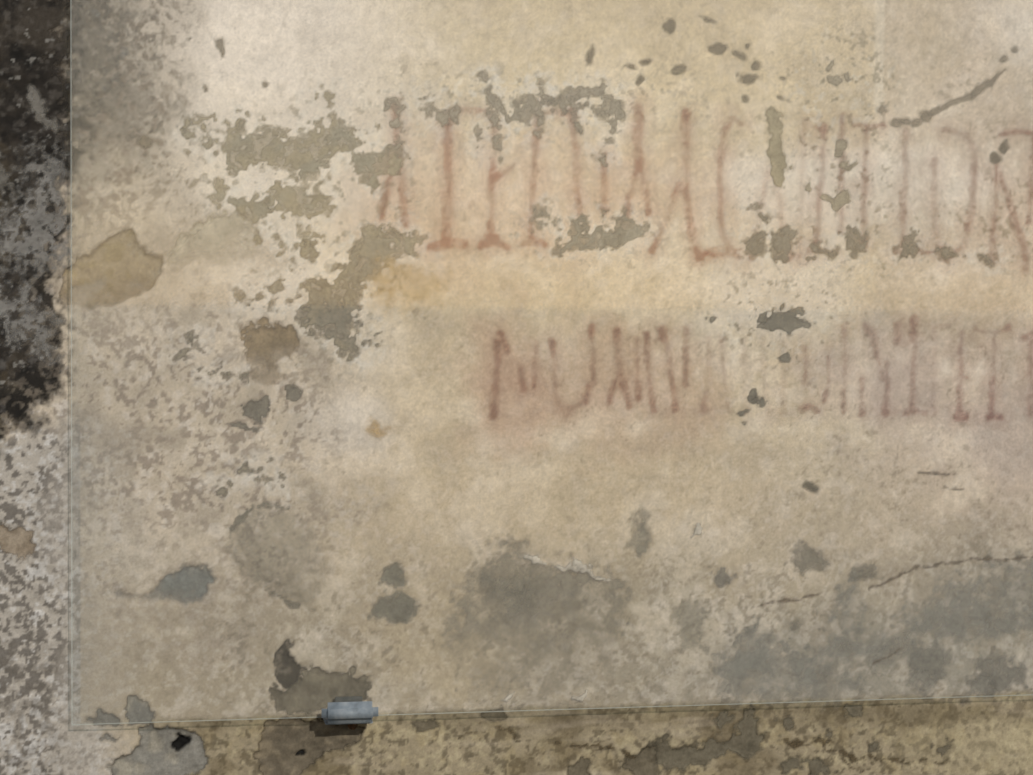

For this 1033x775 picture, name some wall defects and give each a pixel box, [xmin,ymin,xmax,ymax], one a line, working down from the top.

flaking render [419,96,461,127]
flaking render [474,71,626,161]
flaking render [181,91,407,262]
water stain [0,0,141,439]
spalling [60,229,163,307]
flaking render [235,224,427,364]
flaking render [533,208,650,257]
spalling [156,565,214,602]
crack [869,556,1024,589]
spalling [87,695,208,775]
spalling [254,640,371,775]
spalling [620,705,764,775]